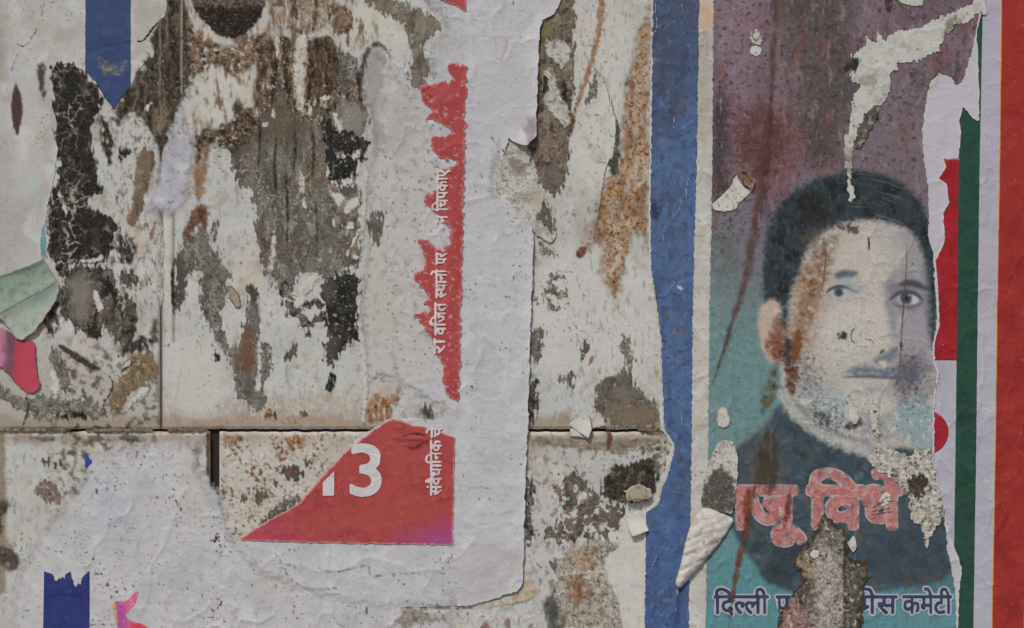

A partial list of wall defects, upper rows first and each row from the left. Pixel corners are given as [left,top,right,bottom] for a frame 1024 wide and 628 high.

spalling [230,0,387,308]
spalling [527,0,616,224]
corrosion [569,0,606,131]
corrosion [576,16,651,299]
spalling [157,214,276,420]
peeling [357,299,369,423]
spalling [532,333,669,548]
corrosion [715,245,753,376]